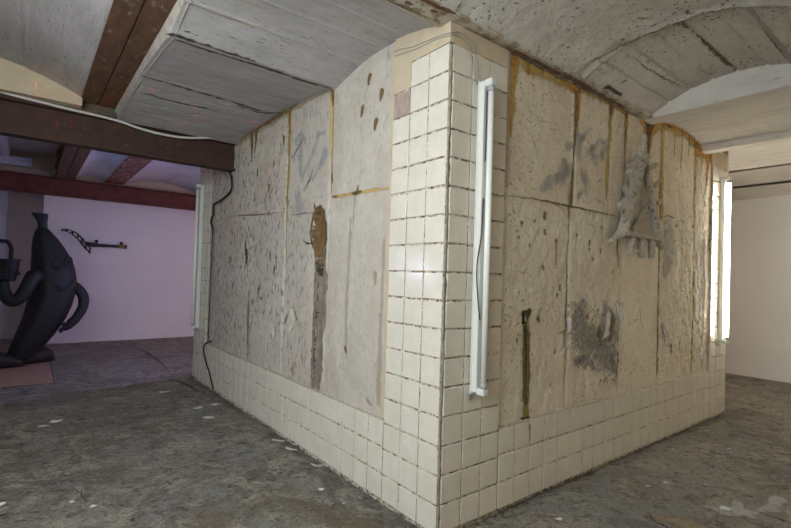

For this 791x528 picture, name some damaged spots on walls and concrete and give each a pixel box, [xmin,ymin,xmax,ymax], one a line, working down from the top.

rust [509,54,628,199]
rust [653,123,712,219]
crack [228,170,328,391]
flaking render [567,300,619,382]
damp [602,302,624,340]